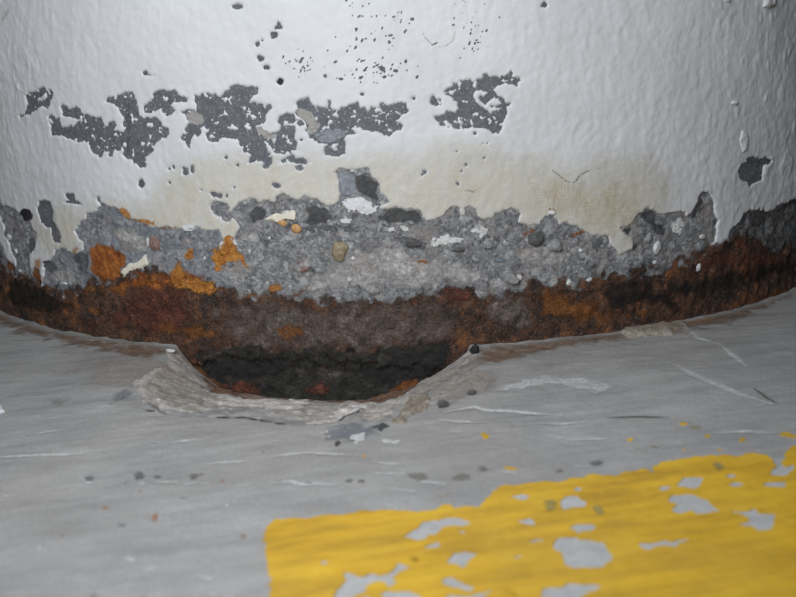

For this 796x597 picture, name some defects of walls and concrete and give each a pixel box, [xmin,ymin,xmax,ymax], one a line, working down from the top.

peeling [323,0,419,84]
peeling [20,85,415,170]
peeling [430,71,521,135]
peeling [738,157,771,186]
spalling [0,168,718,307]
spalling [728,199,796,255]
corrosion [0,233,796,401]
peeling [659,477,720,514]
peeling [405,518,470,548]
peeling [553,524,613,568]
peeling [336,563,420,597]
peeling [541,583,600,597]